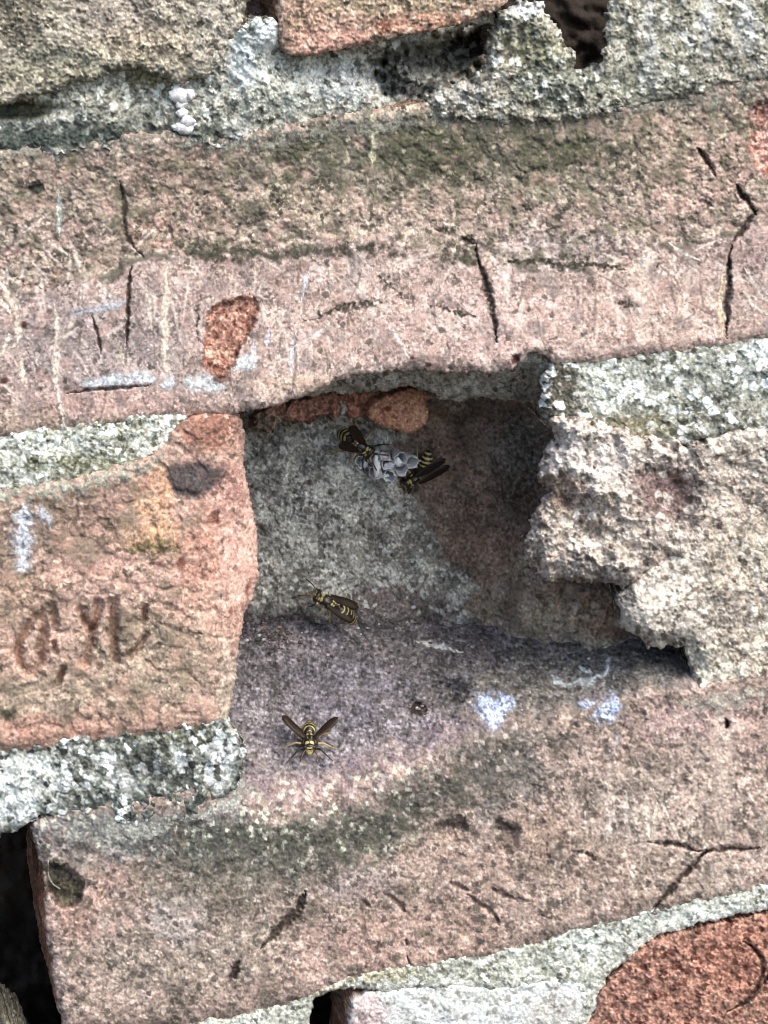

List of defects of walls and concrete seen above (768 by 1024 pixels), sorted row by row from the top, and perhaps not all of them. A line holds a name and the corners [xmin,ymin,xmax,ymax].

leakage [168,81,200,135]
crack [93,181,141,351]
crack [430,237,625,342]
crack [615,300,634,308]
crack [698,147,758,328]
spalling [411,702,427,716]
crack [650,841,755,908]